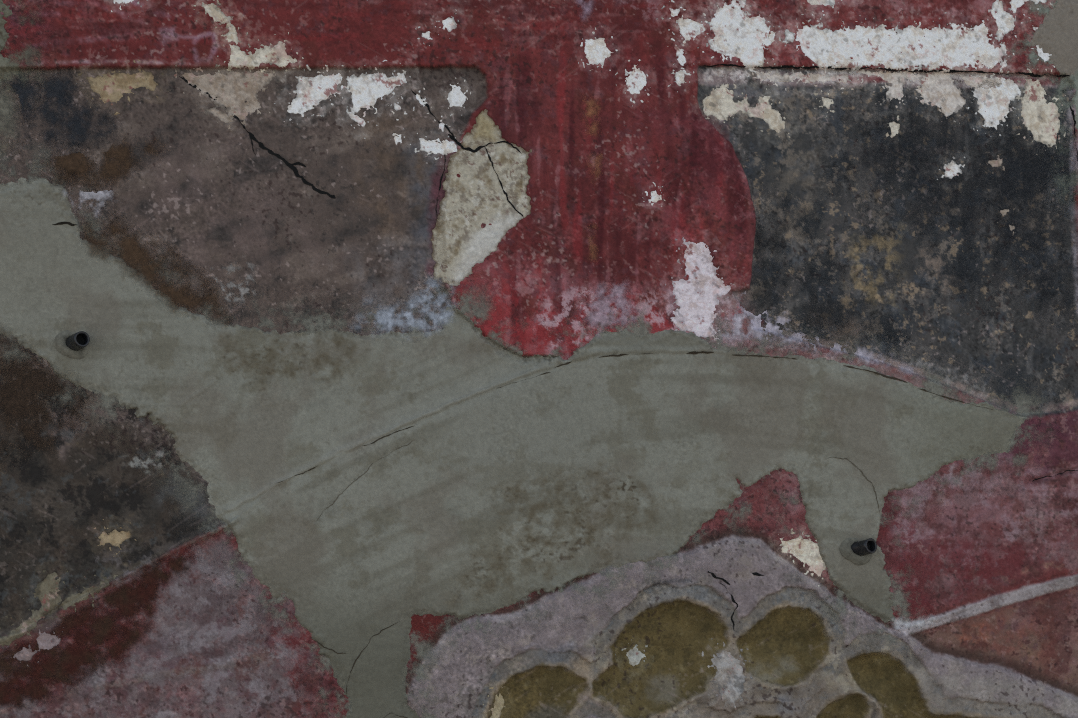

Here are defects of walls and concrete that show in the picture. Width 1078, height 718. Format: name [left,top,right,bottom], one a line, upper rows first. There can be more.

peeling [661,0,1066,155]
crack [704,64,1070,77]
crack [179,76,336,199]
flaking render [78,0,532,286]
crack [412,91,523,216]
crack [1070,106,1078,161]
peeling [665,237,735,348]
crack [687,351,796,359]
crack [843,365,993,410]